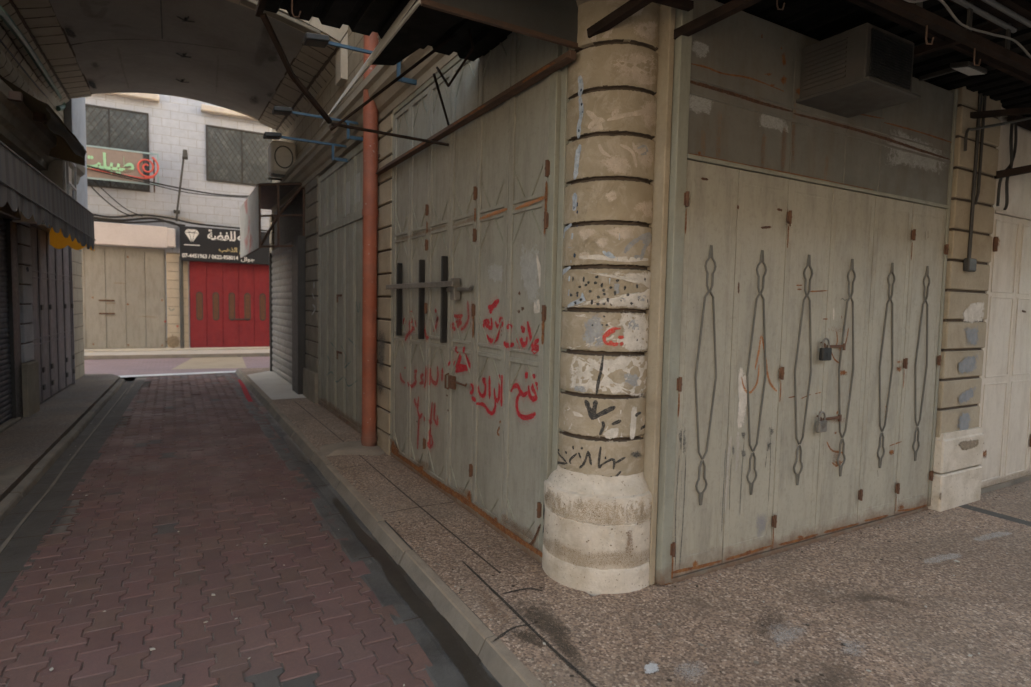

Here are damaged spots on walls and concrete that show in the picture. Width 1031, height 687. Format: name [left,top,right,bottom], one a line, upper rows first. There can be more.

peeling [563,227,652,439]
peeling [962,301,985,323]
rust [390,441,542,557]
rust [665,479,927,585]